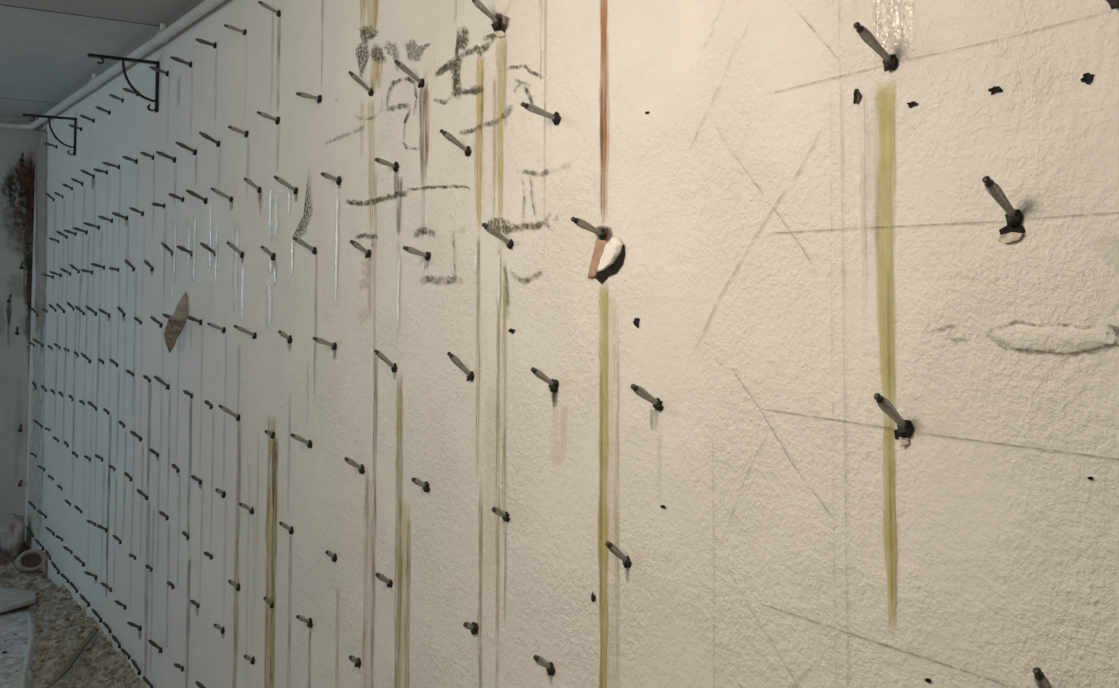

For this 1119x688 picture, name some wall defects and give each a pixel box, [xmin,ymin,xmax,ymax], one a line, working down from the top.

spalling [588,237,624,284]
water stain [861,89,894,401]
water stain [265,426,278,688]
water stain [598,289,608,688]
water stain [883,428,896,619]